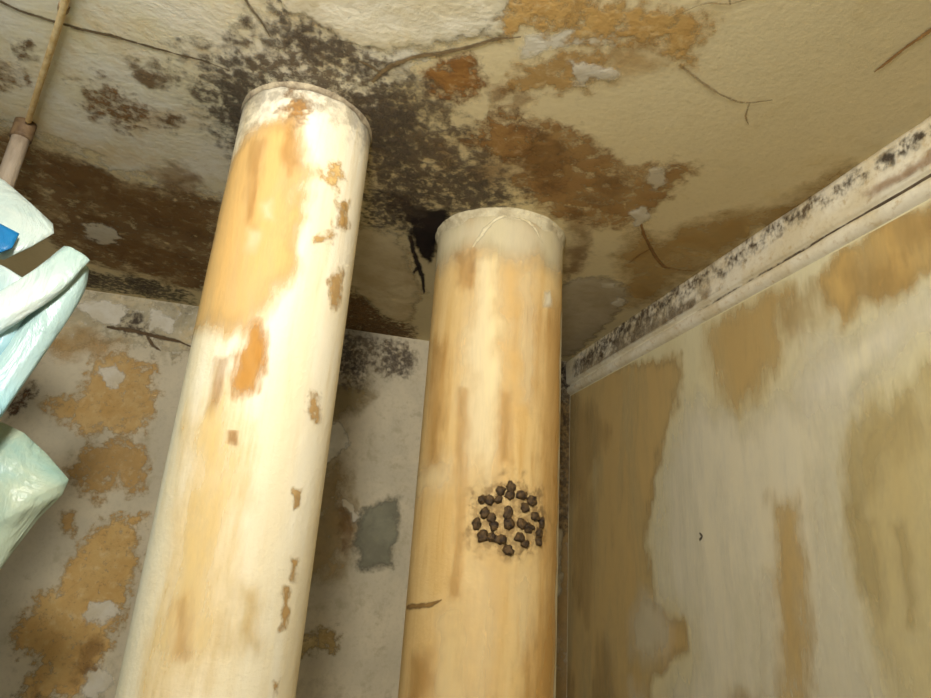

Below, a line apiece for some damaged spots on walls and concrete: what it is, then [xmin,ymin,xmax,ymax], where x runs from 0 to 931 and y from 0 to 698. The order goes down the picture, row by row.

crack [0,0,229,71]
crack [245,0,271,37]
crack [874,28,931,72]
peeling [0,0,715,203]
damp [14,1,695,334]
peeling [629,206,650,226]
crack [408,236,425,293]
damp [819,207,931,325]
peeling [326,422,350,468]
damp [463,254,545,556]
damp [554,172,865,698]
peeling [301,626,340,658]